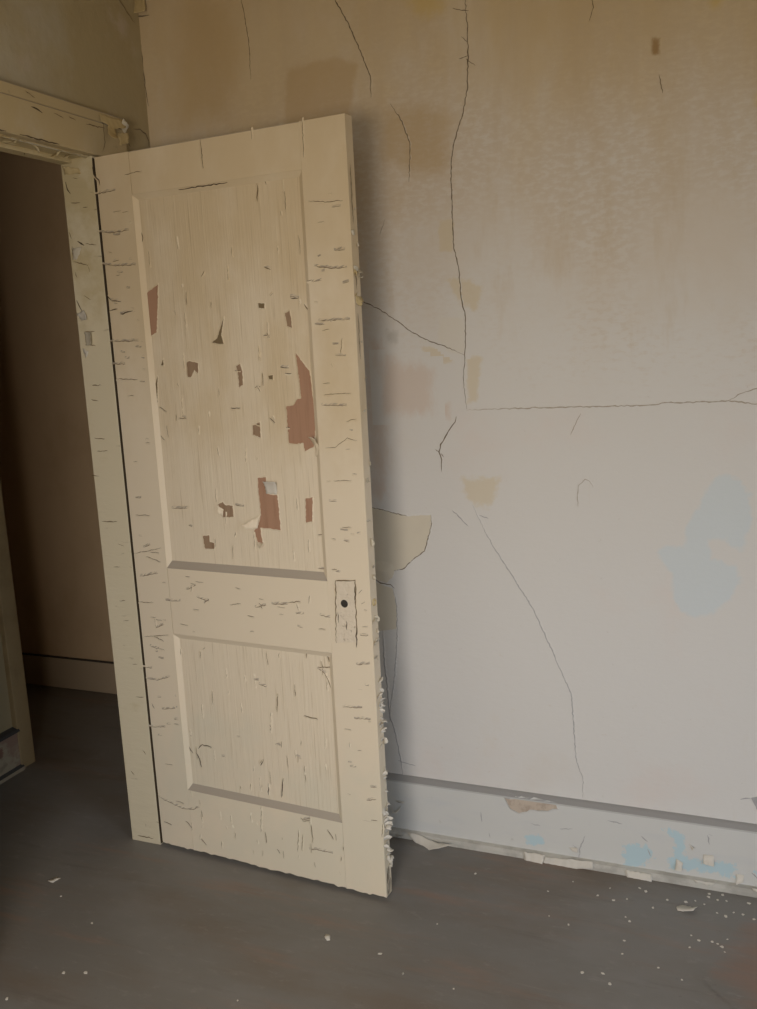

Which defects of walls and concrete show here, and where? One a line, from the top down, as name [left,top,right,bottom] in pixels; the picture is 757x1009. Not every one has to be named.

crack [26,0,151,401]
crack [179,139,228,192]
crack [255,0,757,502]
crack [133,322,292,464]
crack [103,488,586,875]
peeling [503,796,560,814]
peeling [519,829,594,869]
peeling [618,823,757,892]